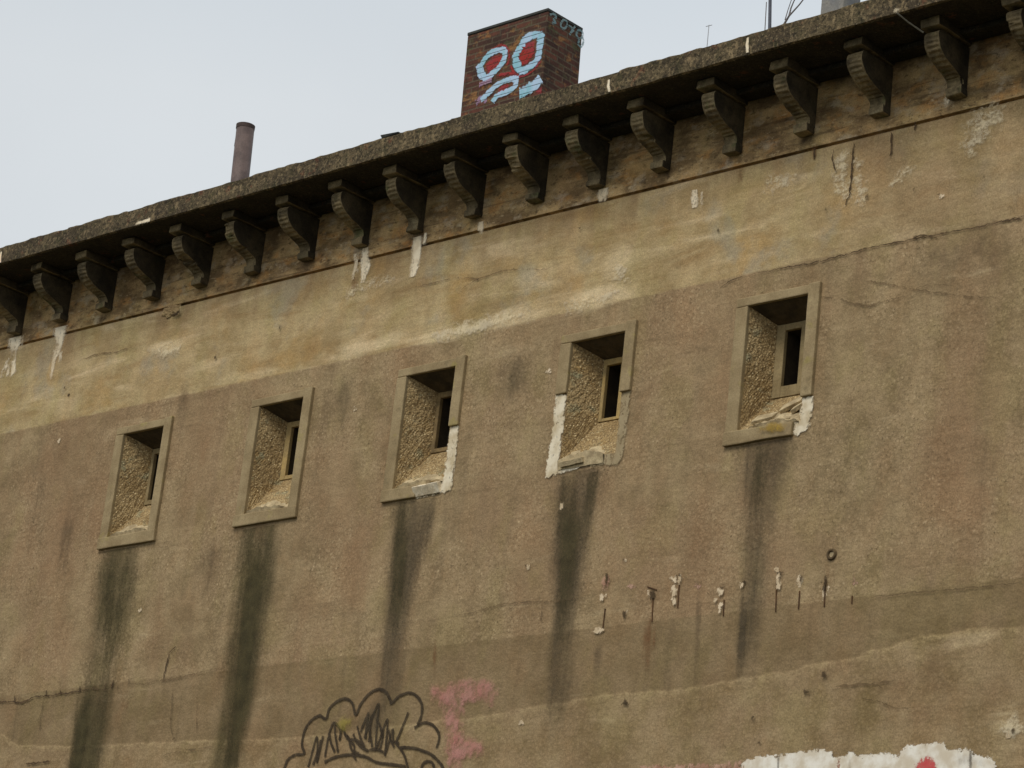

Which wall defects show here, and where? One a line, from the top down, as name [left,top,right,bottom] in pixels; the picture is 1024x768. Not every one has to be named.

crack [813,146,854,205]
leakage [348,247,388,295]
leakage [410,233,427,277]
crack [724,216,1022,285]
crack [821,281,997,307]
leakage [3,336,21,376]
leakage [51,325,67,376]
spalling [416,425,459,498]
spalling [545,391,631,478]
spalling [793,396,813,436]
leakage [217,525,274,768]
leakage [70,677,108,768]